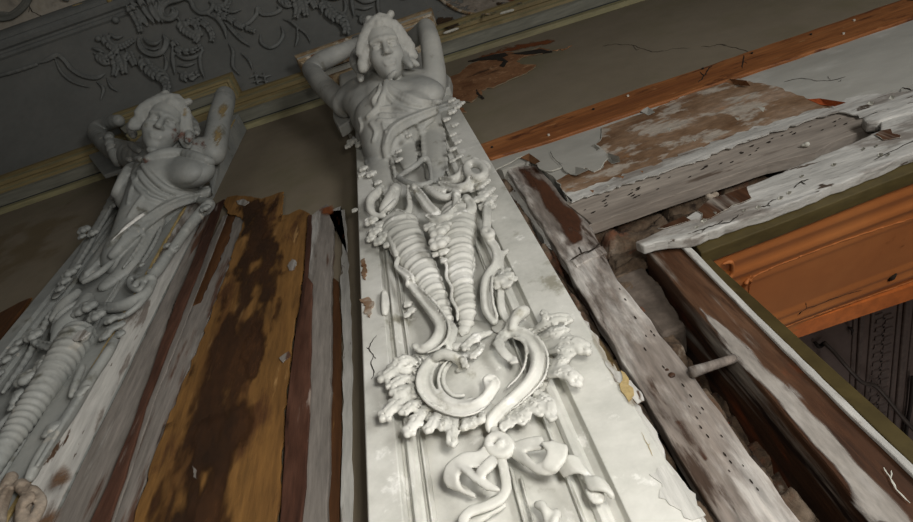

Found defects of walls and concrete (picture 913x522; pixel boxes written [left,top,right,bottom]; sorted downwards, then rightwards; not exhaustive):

spalling [436,0,522,34]
spalling [450,47,552,113]
crack [699,44,748,81]
spalling [493,78,913,244]